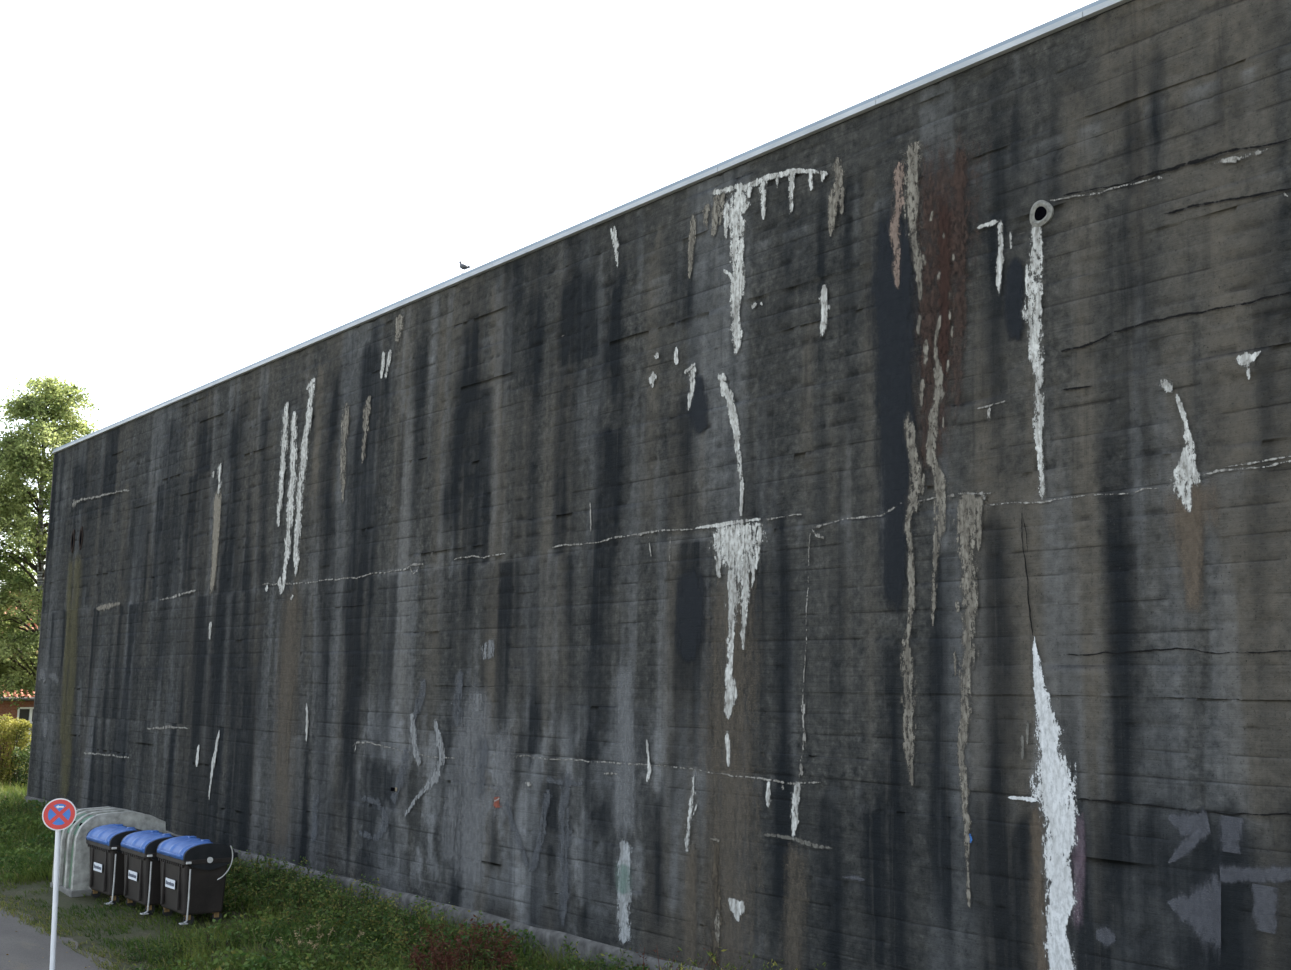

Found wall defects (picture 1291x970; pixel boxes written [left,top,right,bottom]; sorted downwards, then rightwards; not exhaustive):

rust [913,148,979,466]
crack [1203,456,1291,476]
crack [264,563,423,585]
leakage [868,141,984,908]
crack [516,488,1159,790]
crack [1064,647,1291,656]
peeling [1008,636,1078,970]
crack [1073,798,1291,816]
peeling [614,839,634,944]